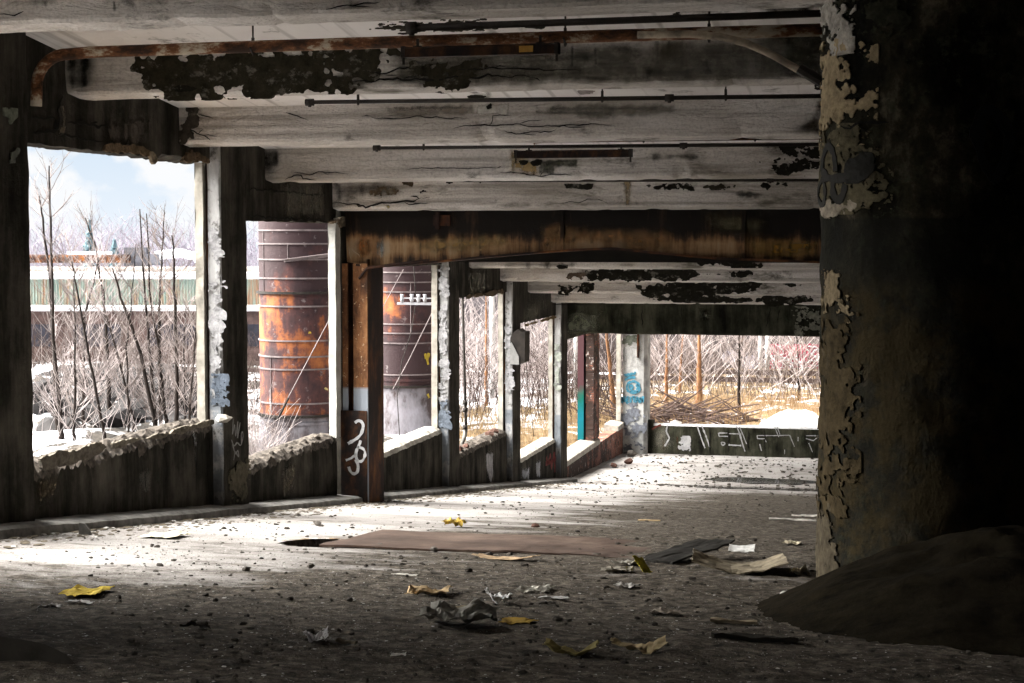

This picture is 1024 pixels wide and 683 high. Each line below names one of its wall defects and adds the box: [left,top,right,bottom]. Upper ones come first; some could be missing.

peeling [819,0,879,64]
peeling [130,48,492,164]
crack [362,115,609,135]
peeling [759,112,894,219]
peeling [207,227,230,407]
spalling [38,419,214,471]
peeling [556,263,862,578]